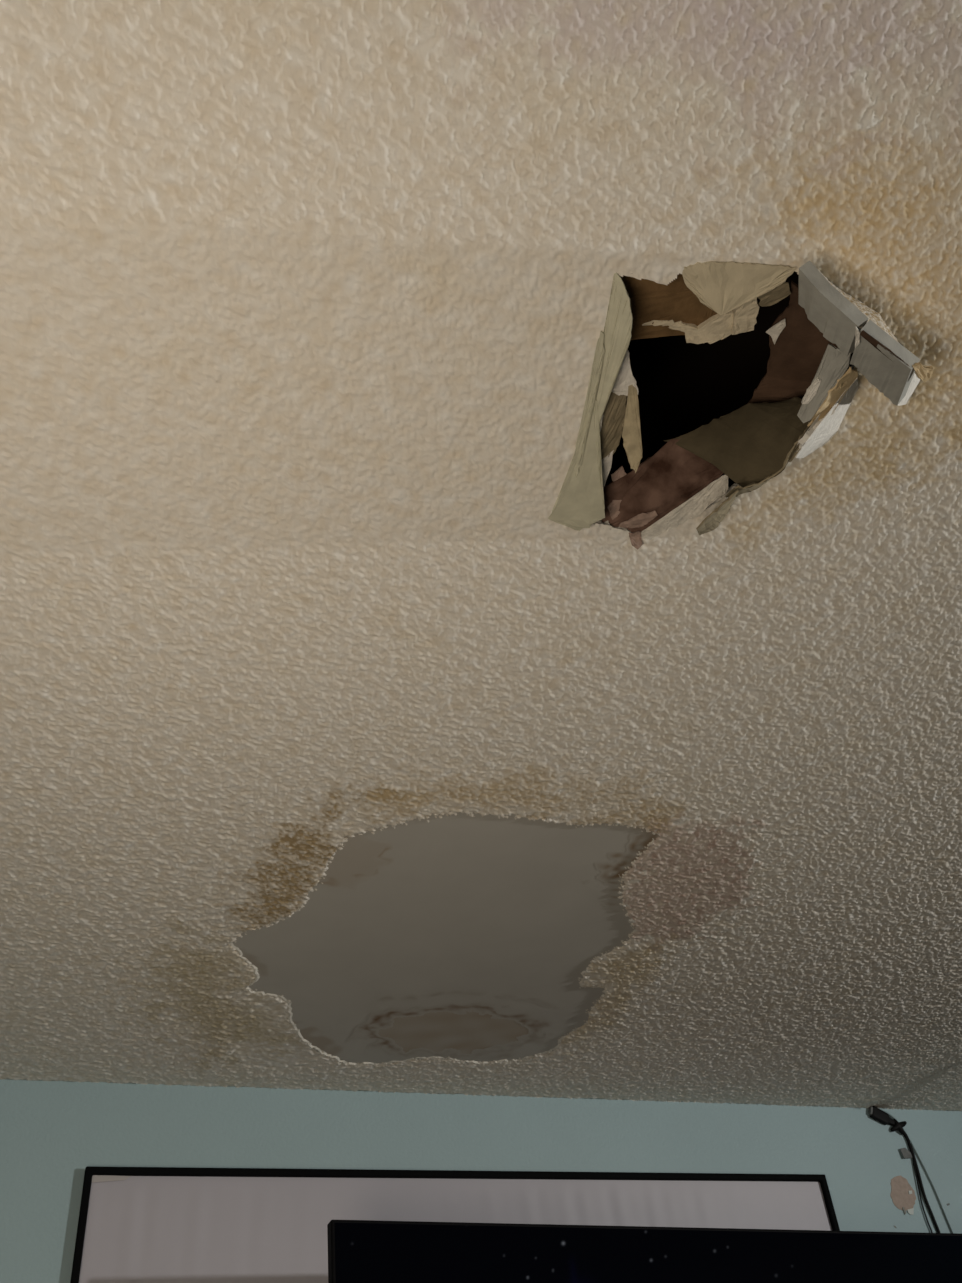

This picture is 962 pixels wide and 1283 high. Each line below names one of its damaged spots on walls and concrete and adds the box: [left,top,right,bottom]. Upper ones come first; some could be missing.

damp [88,743,789,1076]